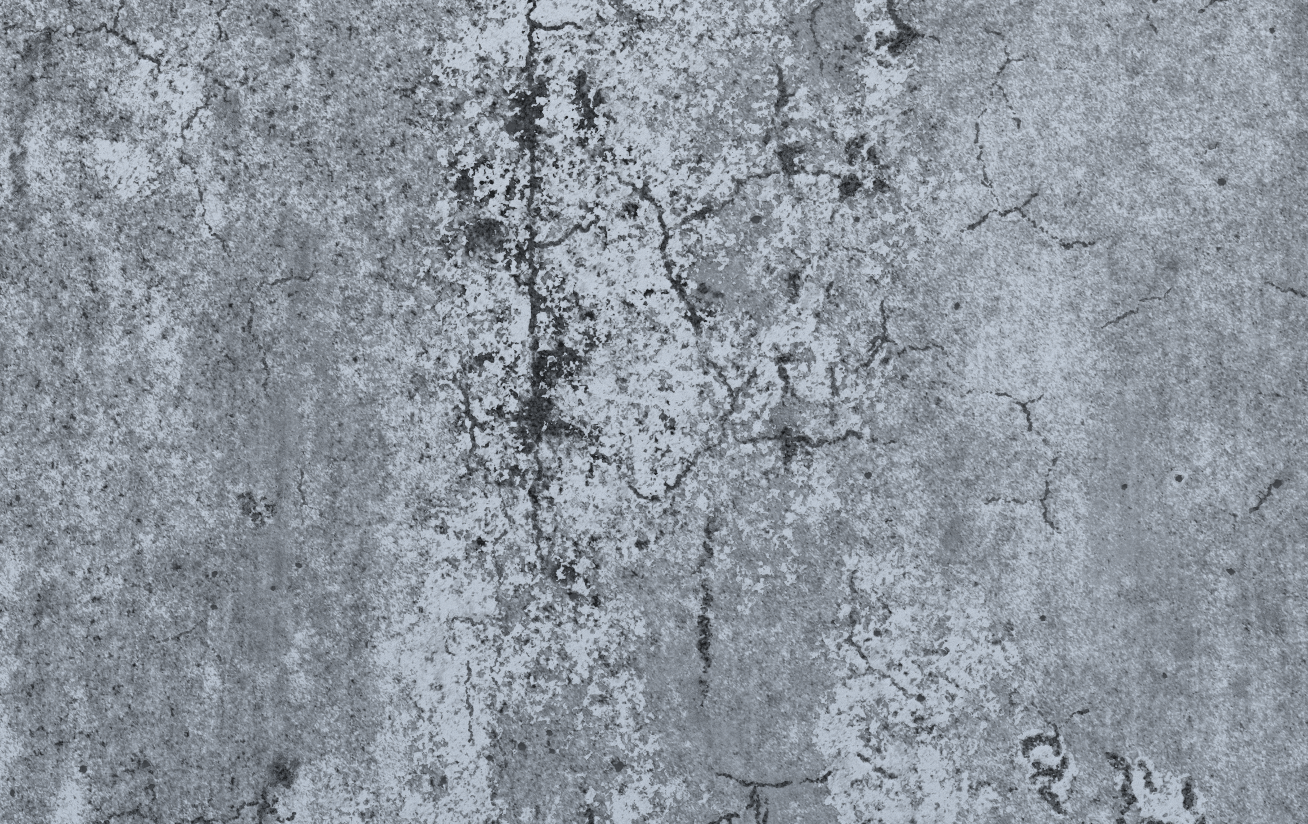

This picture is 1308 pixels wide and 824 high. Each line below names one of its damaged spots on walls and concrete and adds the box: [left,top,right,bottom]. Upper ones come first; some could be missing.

crack [957,27,1095,250]
crack [618,0,1061,534]
crack [443,0,596,824]
crack [92,789,296,824]
crack [709,753,885,824]